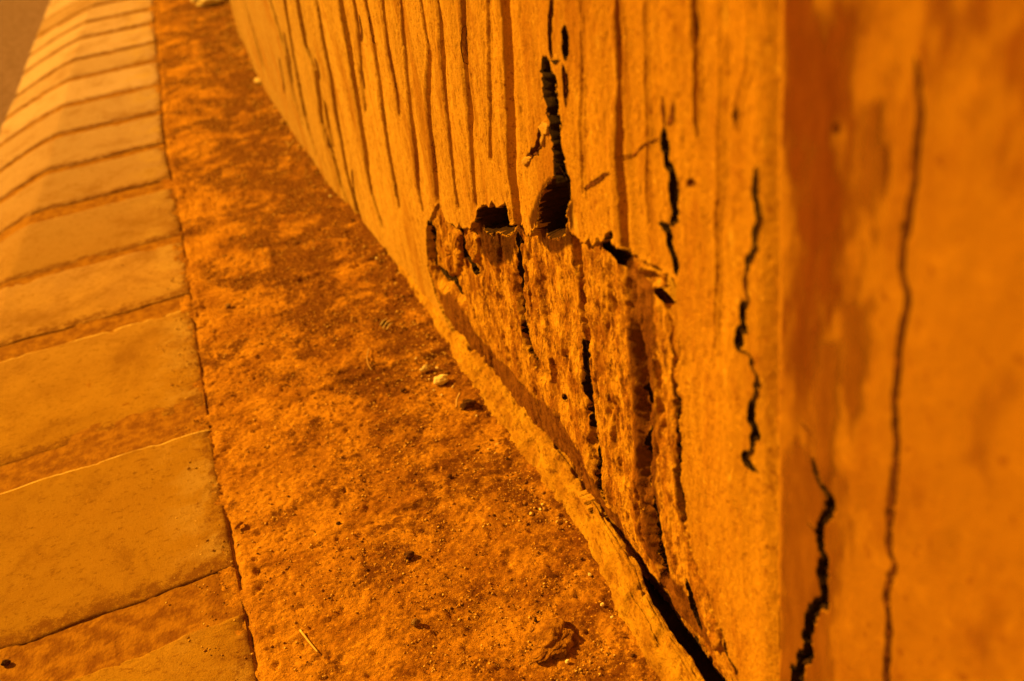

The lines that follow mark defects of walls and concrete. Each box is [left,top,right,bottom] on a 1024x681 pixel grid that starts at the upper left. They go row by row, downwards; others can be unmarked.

crack [521,0,679,276]
spalling [428,167,738,681]
crack [643,381,736,681]
crack [733,166,761,473]
crack [790,422,836,681]
crack [883,56,921,681]